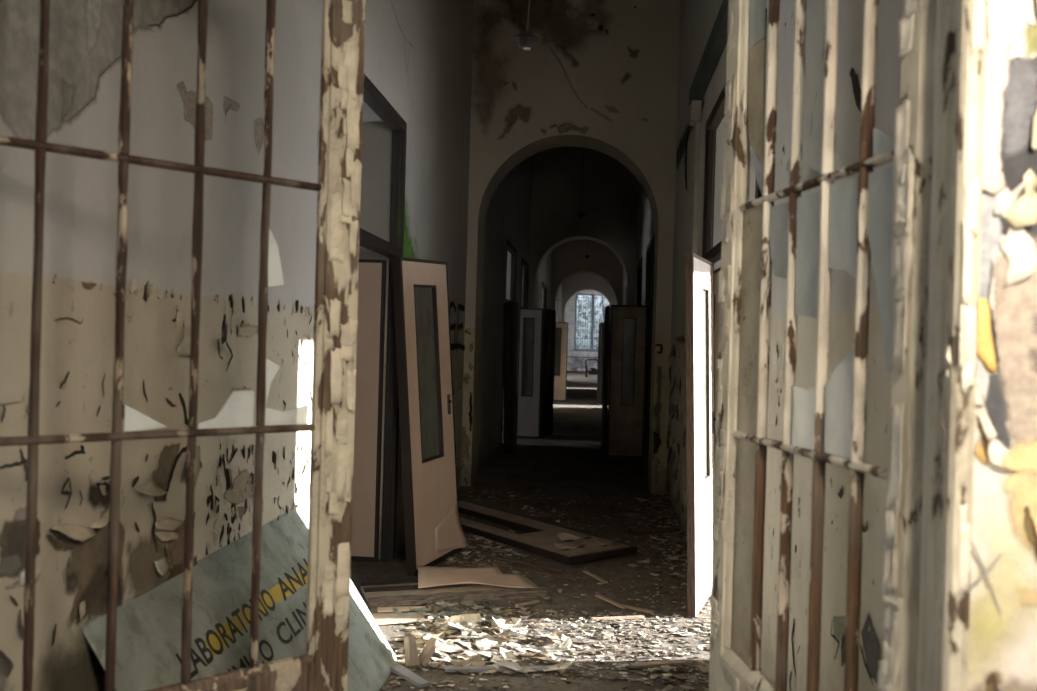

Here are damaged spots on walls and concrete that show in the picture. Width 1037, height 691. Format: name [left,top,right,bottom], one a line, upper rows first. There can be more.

peeling [0,0,197,141]
peeling [328,42,362,264]
leakage [476,0,608,126]
peeling [849,68,861,113]
peeling [970,0,986,57]
peeling [716,264,731,414]
peeling [890,99,915,376]
flaking render [946,42,1037,549]
flaking render [0,443,309,625]
peeling [712,429,726,542]
peeling [860,403,904,691]
flaking render [977,672,1037,691]